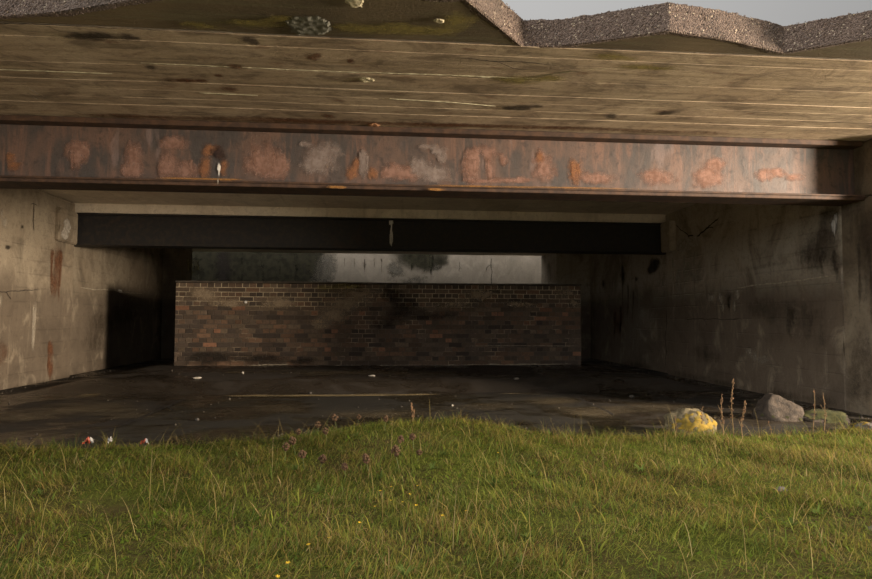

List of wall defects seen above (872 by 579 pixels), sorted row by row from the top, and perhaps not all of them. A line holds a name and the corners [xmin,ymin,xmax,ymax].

corrosion [227,115,645,131]
corrosion [121,143,143,178]
corrosion [328,144,621,191]
damp [381,254,447,283]